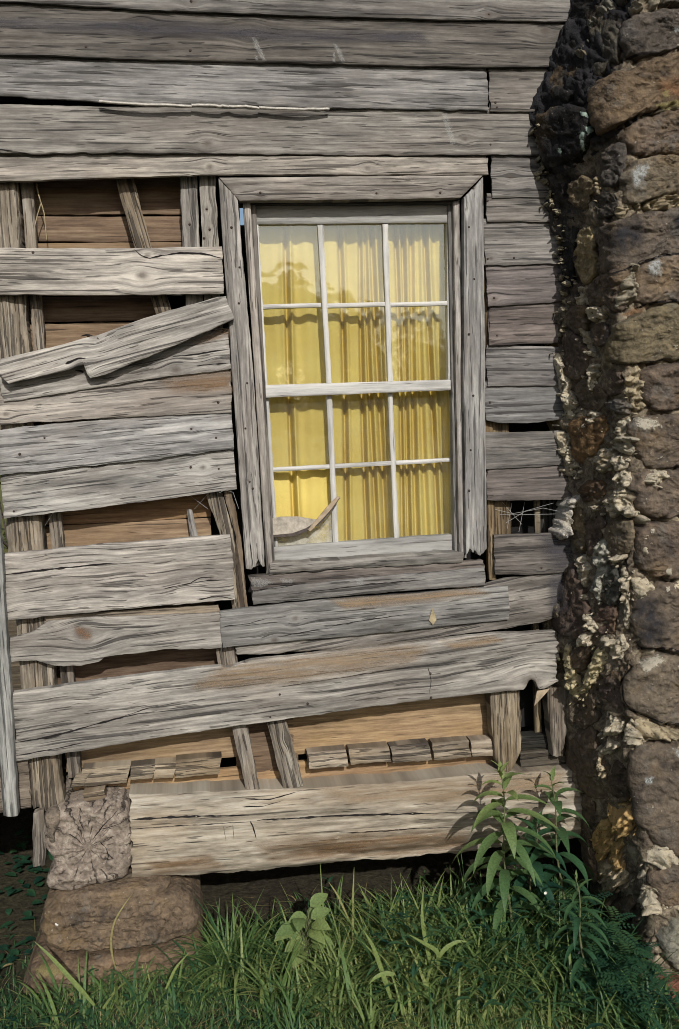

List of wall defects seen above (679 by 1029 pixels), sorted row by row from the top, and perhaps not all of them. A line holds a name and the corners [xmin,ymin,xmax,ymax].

crack [65,334,99,373]
crack [178,349,228,366]
crack [69,790,457,863]